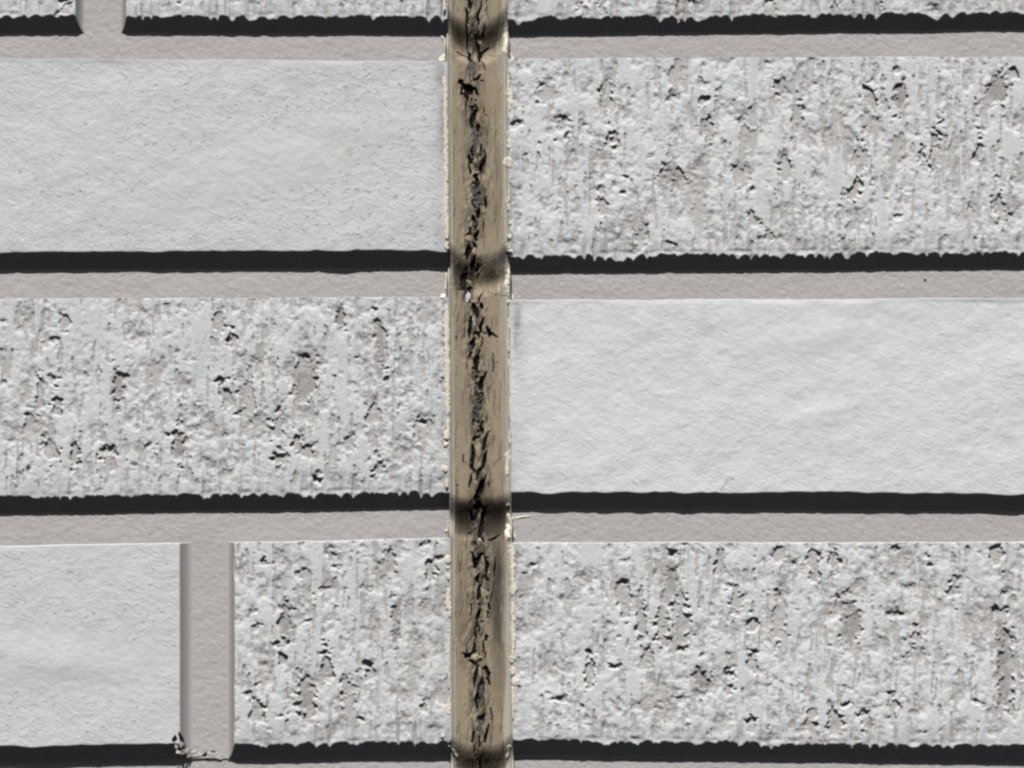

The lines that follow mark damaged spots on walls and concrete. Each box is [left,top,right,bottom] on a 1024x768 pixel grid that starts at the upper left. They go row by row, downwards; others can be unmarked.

crack [13,0,505,768]